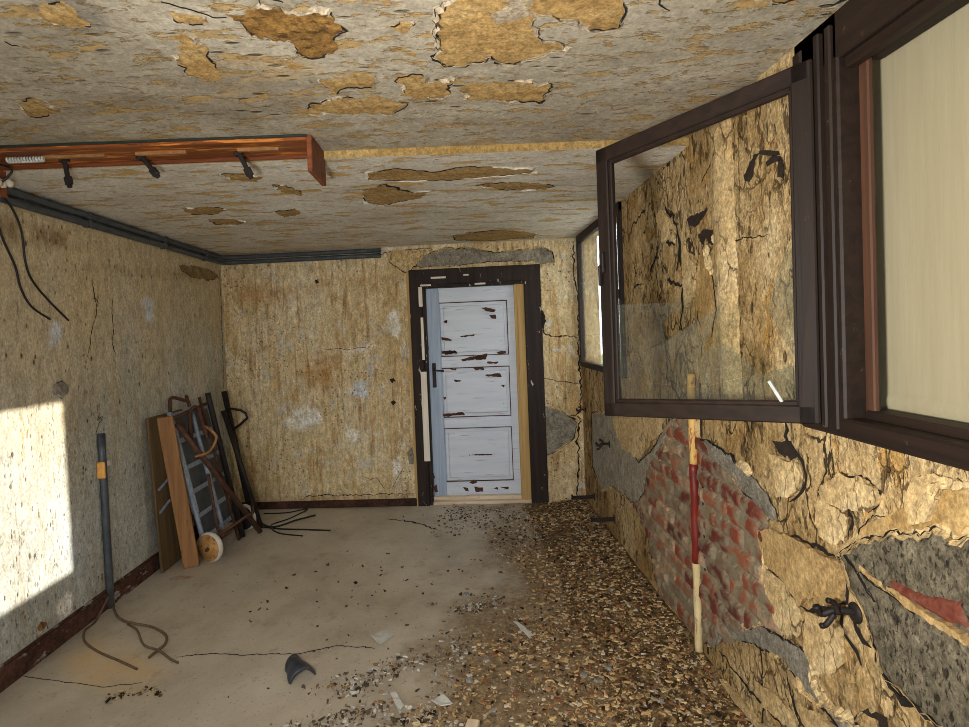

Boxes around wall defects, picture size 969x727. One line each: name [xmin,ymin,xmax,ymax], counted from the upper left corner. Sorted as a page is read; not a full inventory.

crack [161,1,226,19]
peeling [306,0,627,118]
peeling [217,173,304,196]
peeling [362,166,555,206]
peeling [182,206,247,226]
peeling [272,208,304,218]
flaking render [415,230,555,268]
flaking render [545,406,577,456]
flaking render [591,410,969,727]
crack [768,475,937,727]
crack [704,631,800,726]